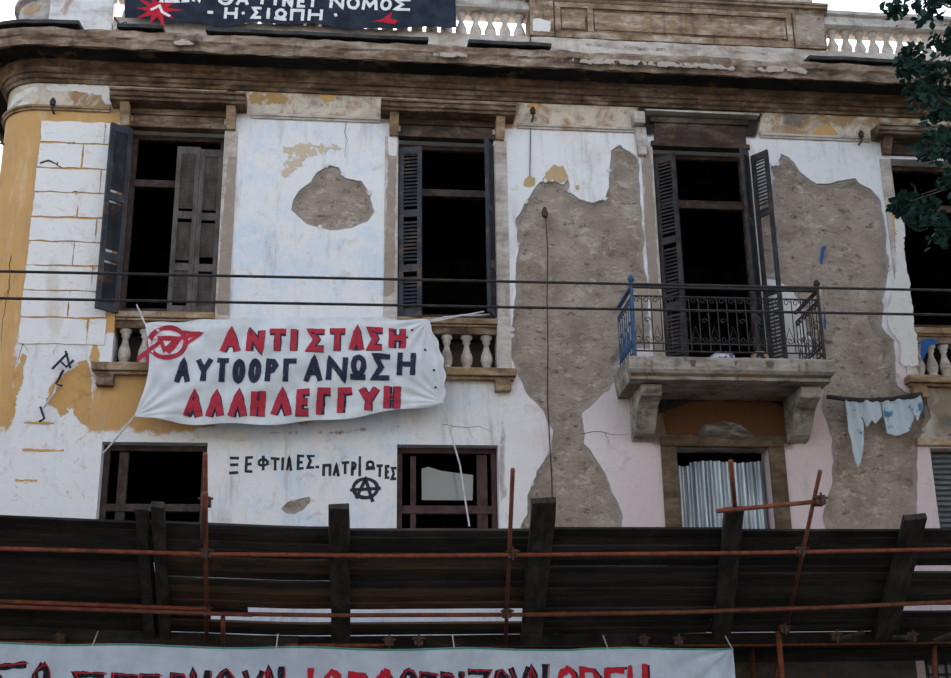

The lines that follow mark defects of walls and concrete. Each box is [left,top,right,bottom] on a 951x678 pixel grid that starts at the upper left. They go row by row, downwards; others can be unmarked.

flaking render [280,143,374,230]
flaking render [383,158,397,297]
peeling [5,345,100,433]
flaking render [508,144,663,528]
flaking render [761,155,930,529]
flaking render [282,497,315,514]